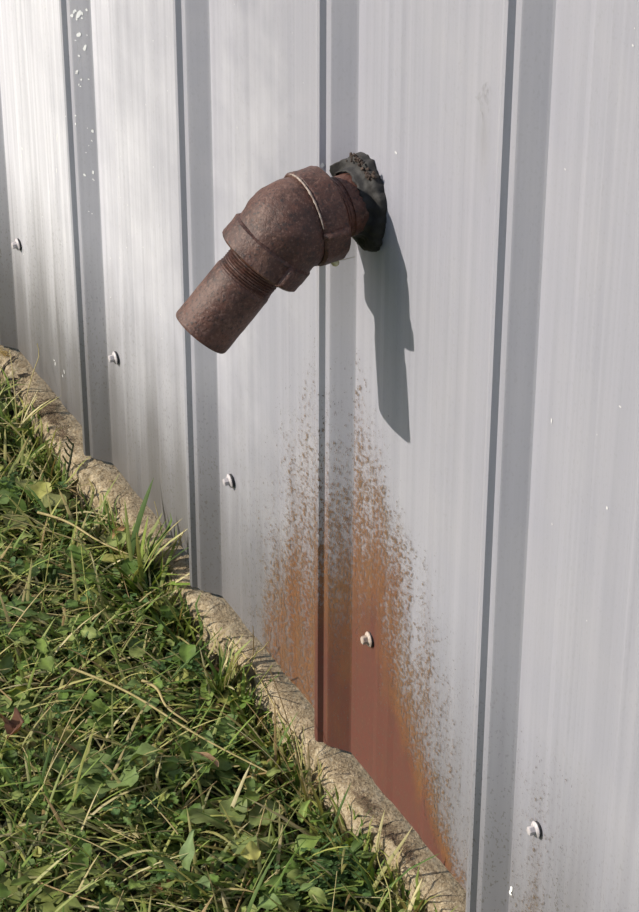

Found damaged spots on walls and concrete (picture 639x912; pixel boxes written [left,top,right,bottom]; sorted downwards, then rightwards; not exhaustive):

corrosion [248,340,469,889]